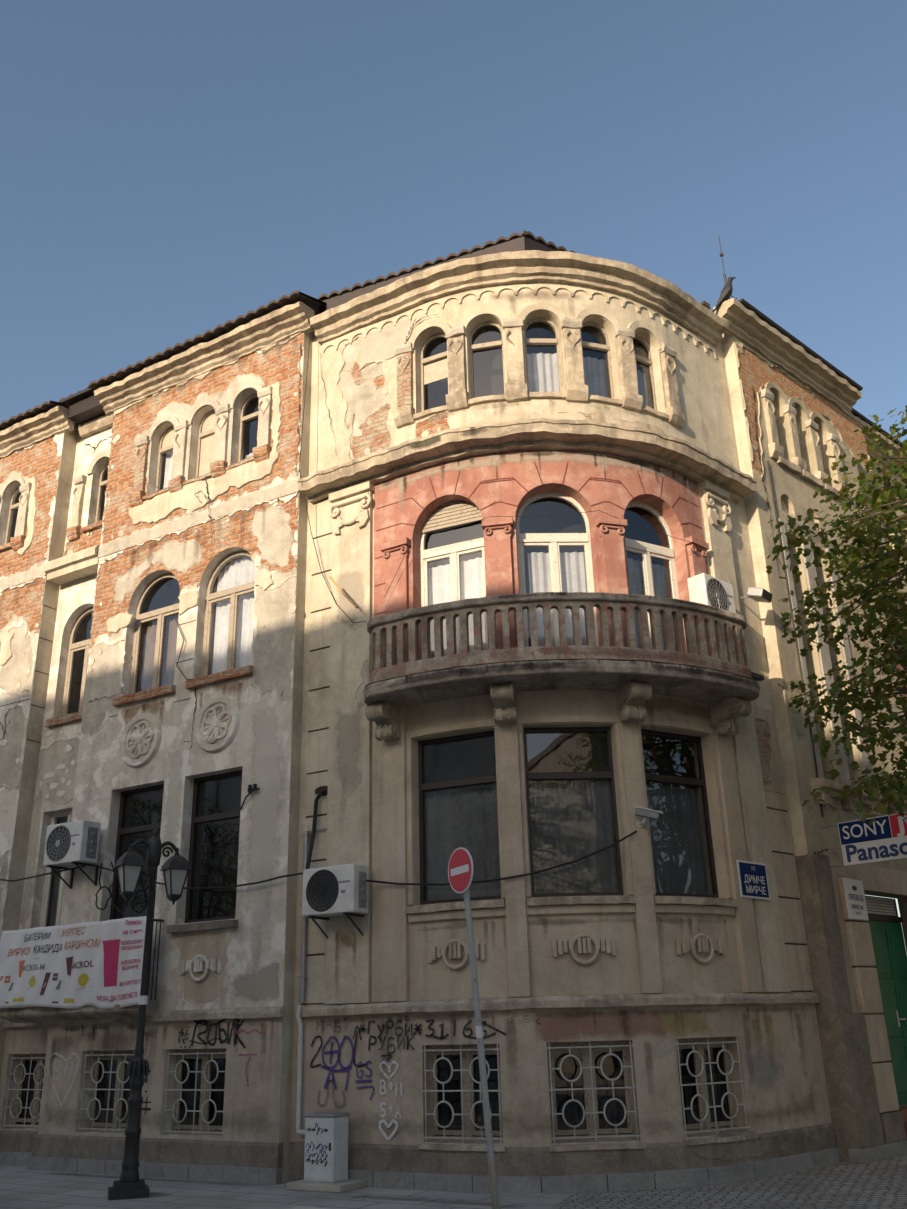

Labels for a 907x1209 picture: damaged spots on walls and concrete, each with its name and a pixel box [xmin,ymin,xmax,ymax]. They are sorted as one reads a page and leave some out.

crack [294,344,337,471]
spalling [335,318,414,461]
spalling [0,332,304,809]
crack [182,675,197,767]